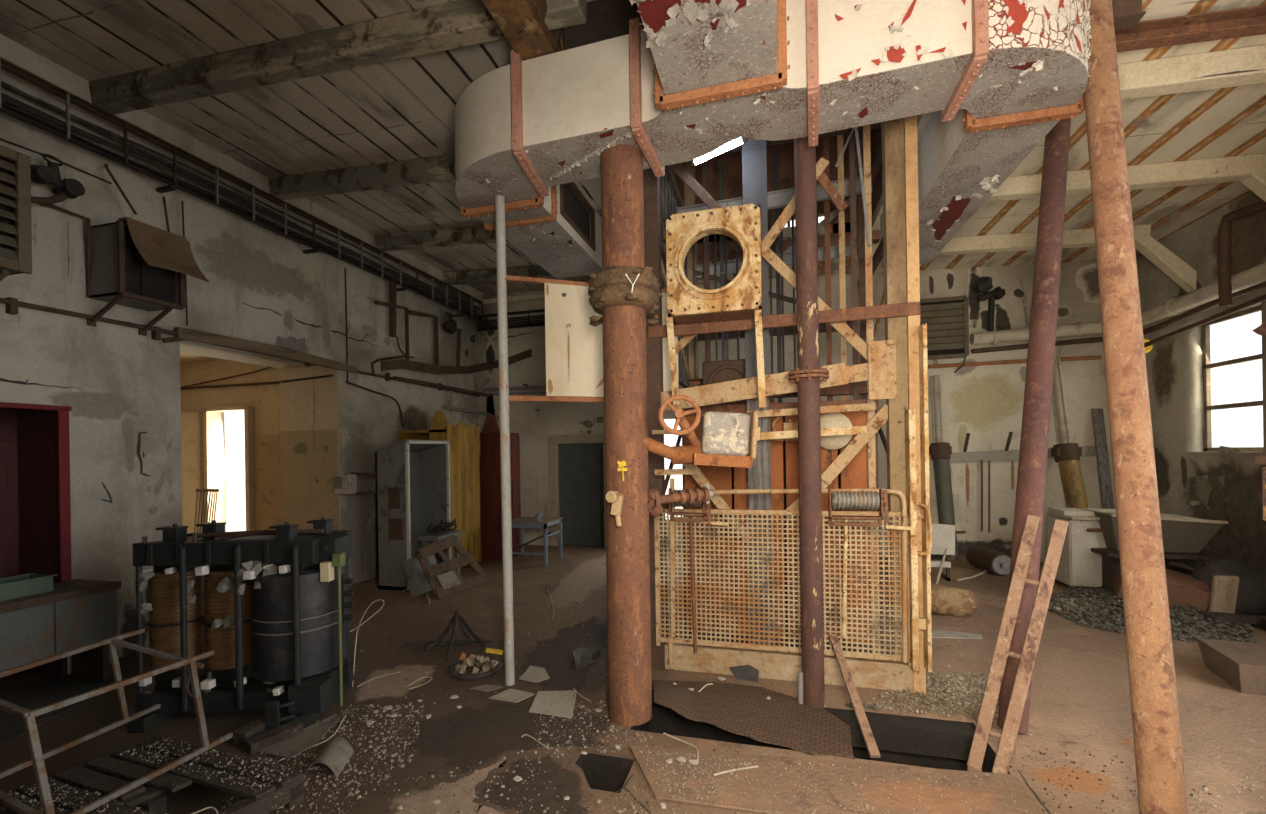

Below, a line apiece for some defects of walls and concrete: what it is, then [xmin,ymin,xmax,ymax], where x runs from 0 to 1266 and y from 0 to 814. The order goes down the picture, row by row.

peeling [630,0,750,50]
peeling [839,0,954,82]
peeling [1003,0,1092,77]
peeling [1007,60,1046,84]
peeling [830,96,868,119]
peeling [927,174,1000,245]
crack [0,378,81,389]
rust [1022,764,1123,799]